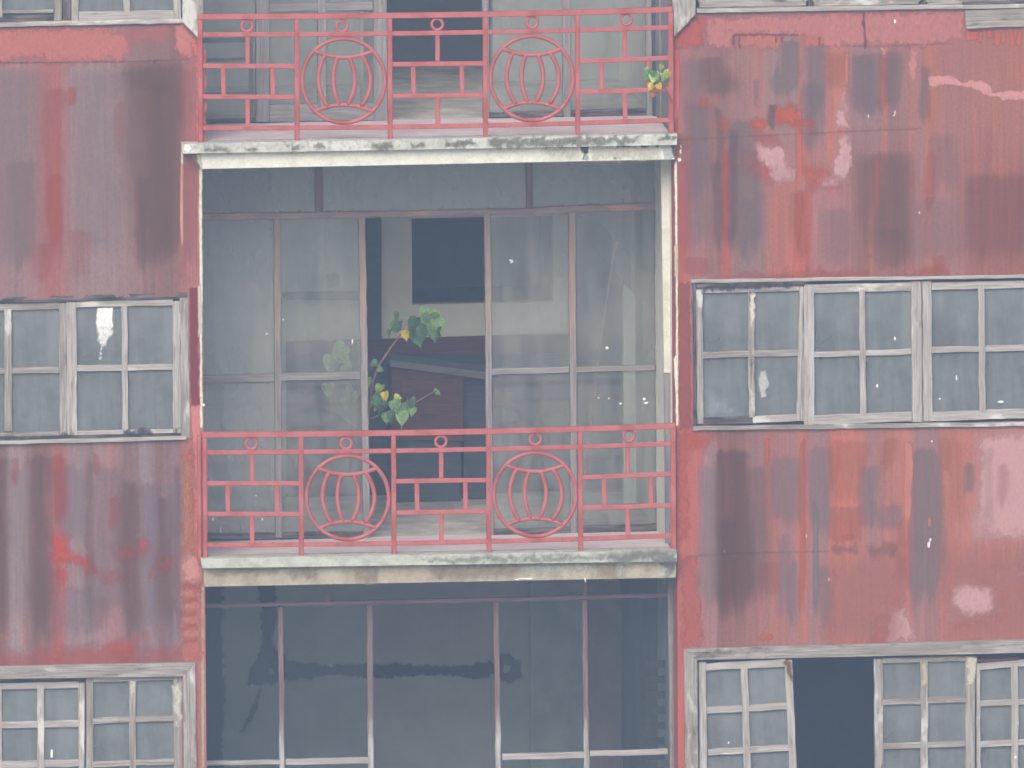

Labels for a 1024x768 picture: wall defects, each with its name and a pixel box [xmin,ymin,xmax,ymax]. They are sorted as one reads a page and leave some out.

peeling [673,10,1024,101]
leakage [488,134,676,159]
peeling [755,141,796,180]
peeling [823,109,852,186]
leakage [290,567,315,579]
leakage [432,543,677,579]
peeling [951,585,993,618]
leakage [954,561,1024,632]
leakage [0,648,176,665]